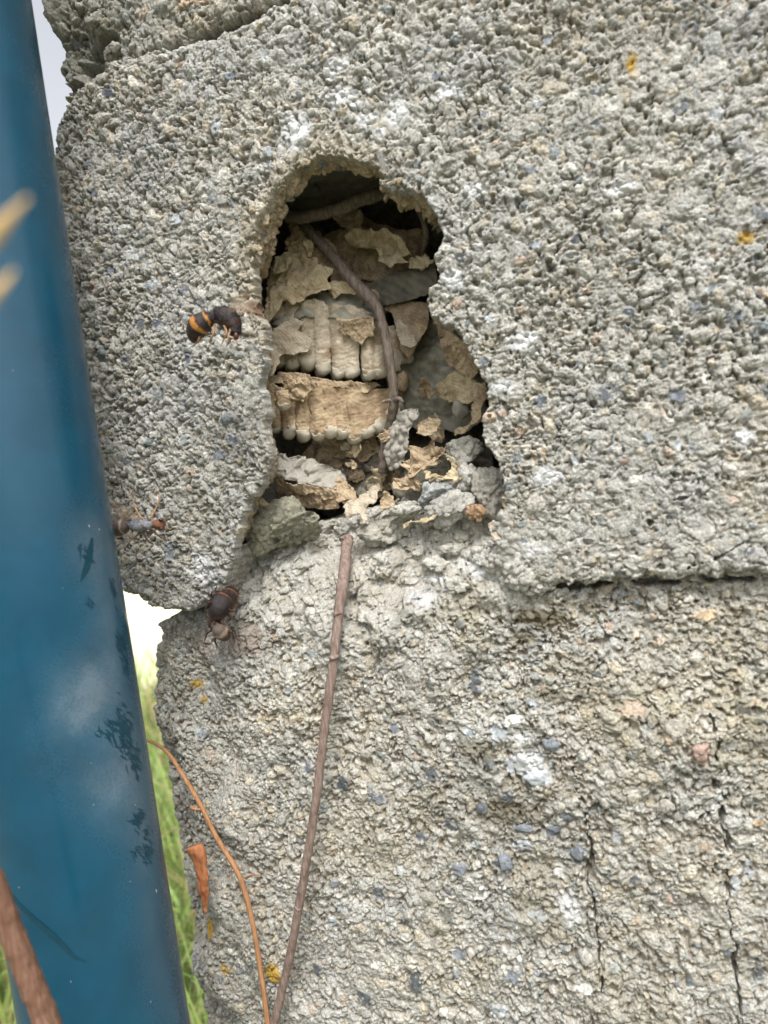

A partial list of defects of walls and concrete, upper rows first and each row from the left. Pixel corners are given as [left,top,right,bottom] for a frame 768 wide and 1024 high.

spalling [251,157,442,319]
spalling [224,495,569,651]
crack [556,541,758,591]
crack [565,755,606,994]
crack [664,713,744,1024]